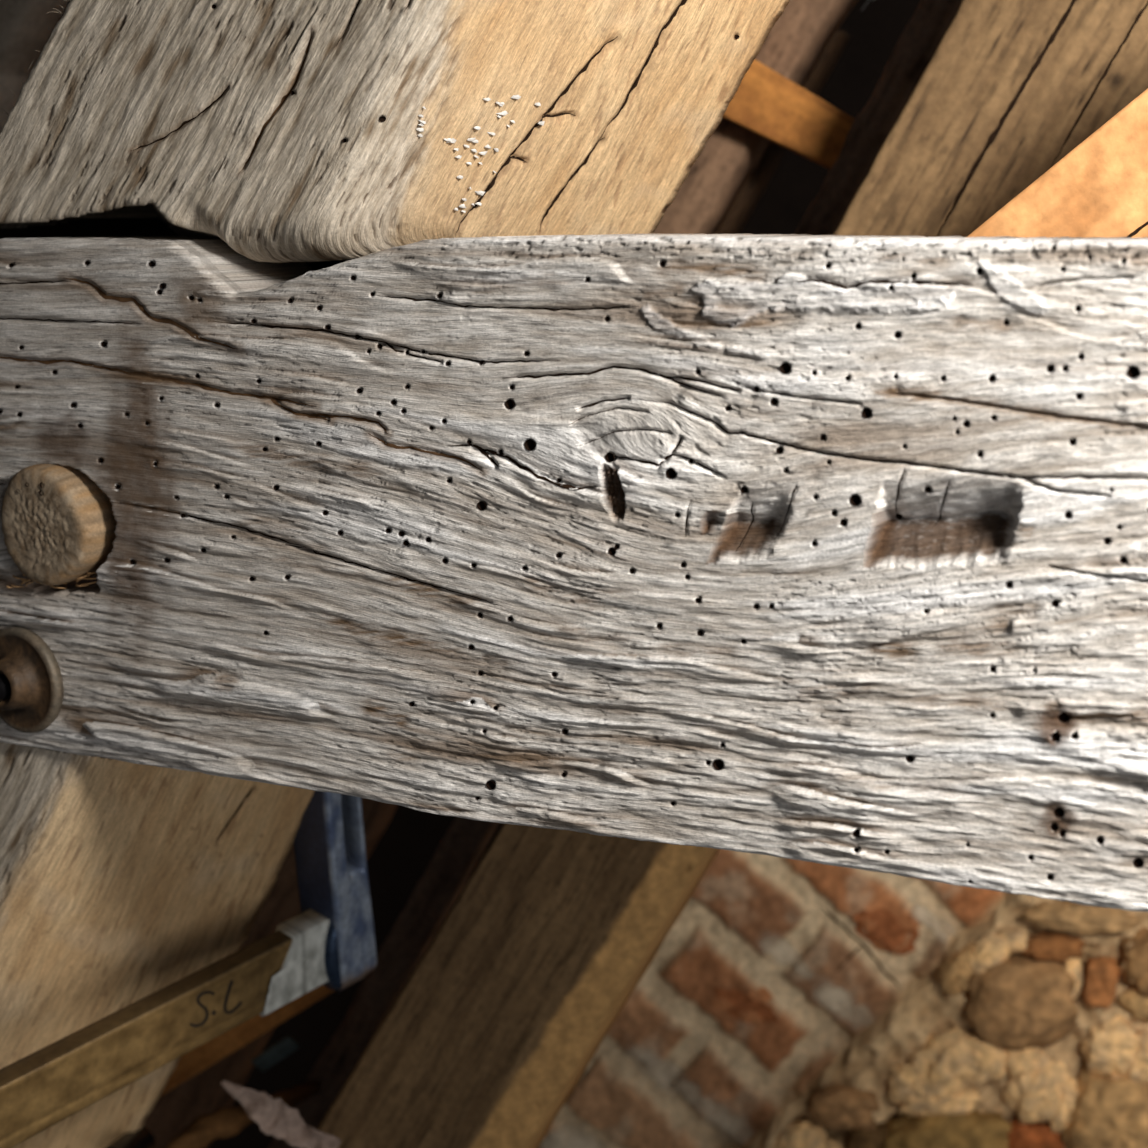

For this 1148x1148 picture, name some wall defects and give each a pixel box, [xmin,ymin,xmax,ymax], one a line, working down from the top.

crack [456,36,618,233]
crack [540,0,687,230]
crack [0,277,1148,497]